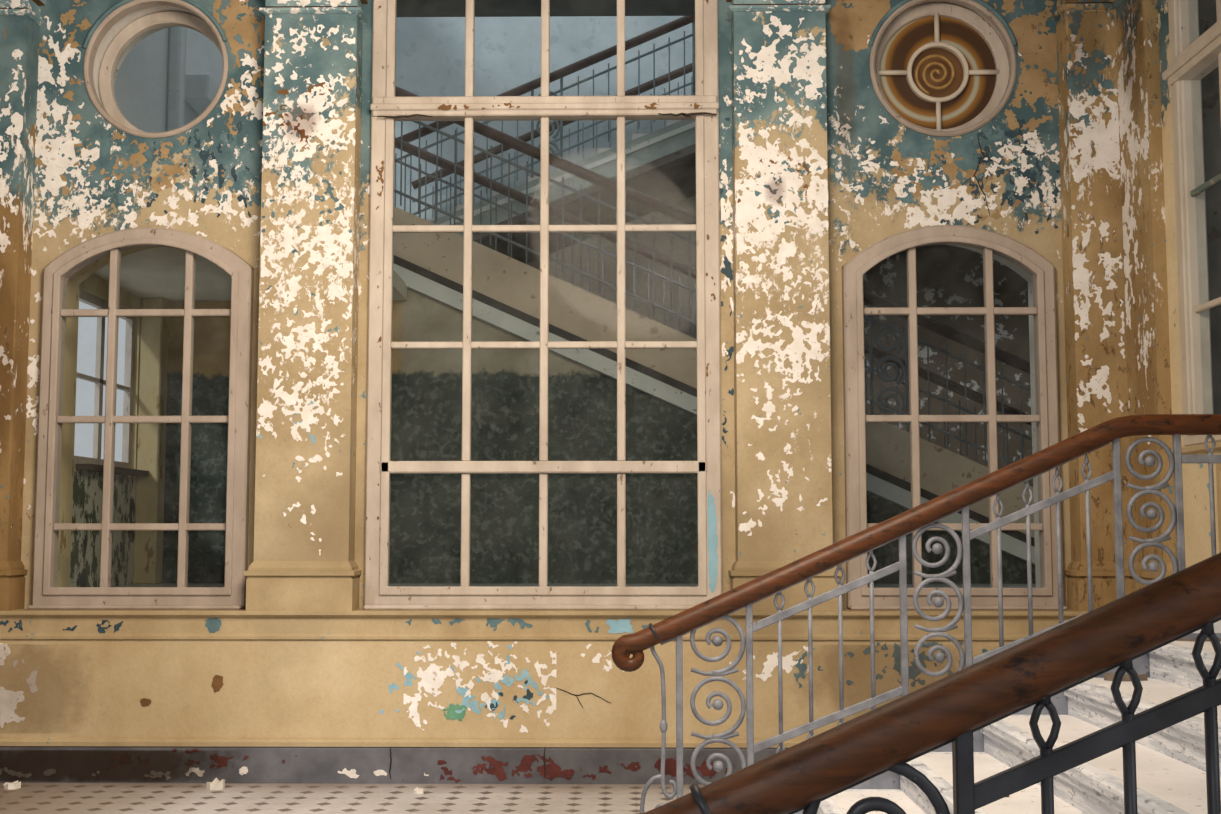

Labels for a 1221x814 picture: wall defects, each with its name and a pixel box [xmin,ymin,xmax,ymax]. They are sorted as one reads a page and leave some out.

peeling [376,161,384,209]
peeling [0,0,356,482]
peeling [706,0,1155,536]
peeling [283,502,322,555]
peeling [708,490,718,593]
peeling [580,644,624,672]
peeling [403,641,556,733]
peeling [338,768,359,778]
peeling [424,754,727,783]